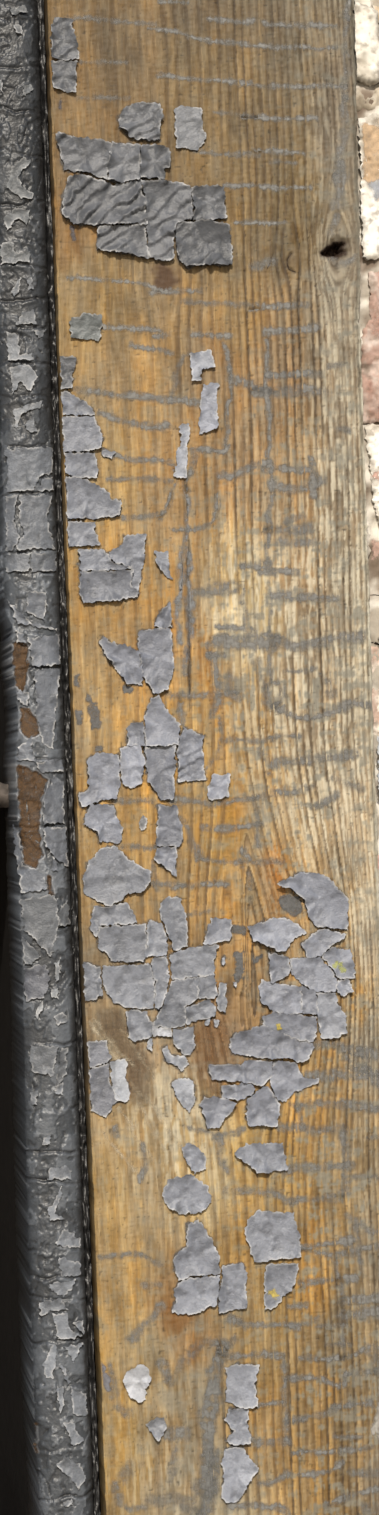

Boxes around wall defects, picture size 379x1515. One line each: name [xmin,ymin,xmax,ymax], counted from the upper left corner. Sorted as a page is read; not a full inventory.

peeling [10,5,28,34]
peeling [50,17,79,93]
peeling [0,157,34,296]
peeling [55,101,233,269]
peeling [4,309,173,604]
peeling [173,349,220,478]
peeling [8,591,356,1173]
peeling [162,1142,301,1315]
peeling [39,1165,88,1507]
peeling [123,1364,151,1403]
peeling [146,1417,167,1441]
peeling [220,1362,260,1503]